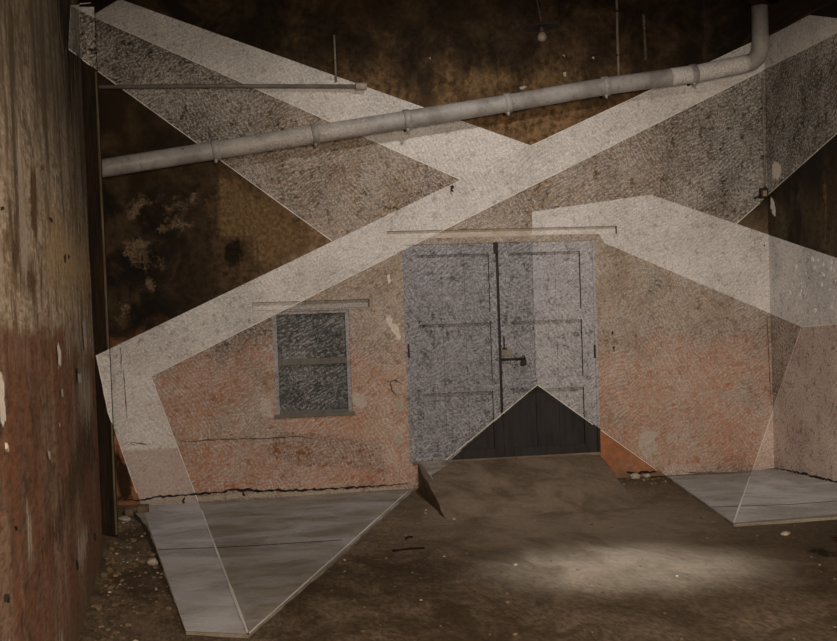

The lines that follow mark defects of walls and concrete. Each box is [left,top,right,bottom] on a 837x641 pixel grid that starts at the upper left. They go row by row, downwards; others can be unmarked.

crack [118,483,407,565]